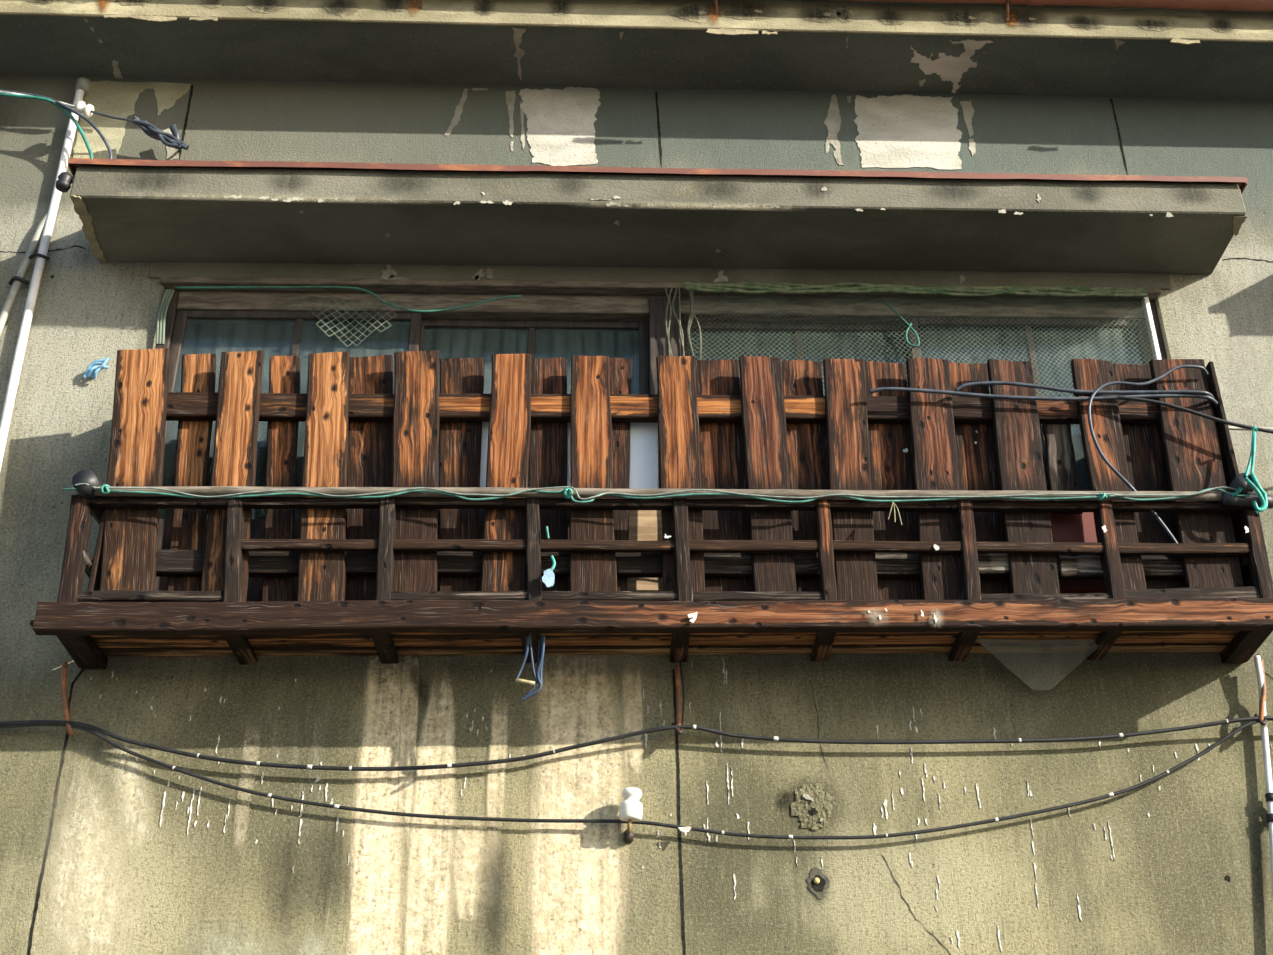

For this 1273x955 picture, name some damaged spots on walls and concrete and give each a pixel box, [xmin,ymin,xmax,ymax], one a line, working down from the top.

peeling [73,60,191,160]
peeling [505,27,601,166]
peeling [824,39,994,170]
crack [27,669,84,955]
water stain [159,775,209,835]
water stain [223,735,264,844]
water stain [272,655,665,955]
crack [672,669,686,955]
spalling [780,783,835,830]
water stain [873,748,946,835]
water stain [58,817,113,952]
crack [881,854,951,955]